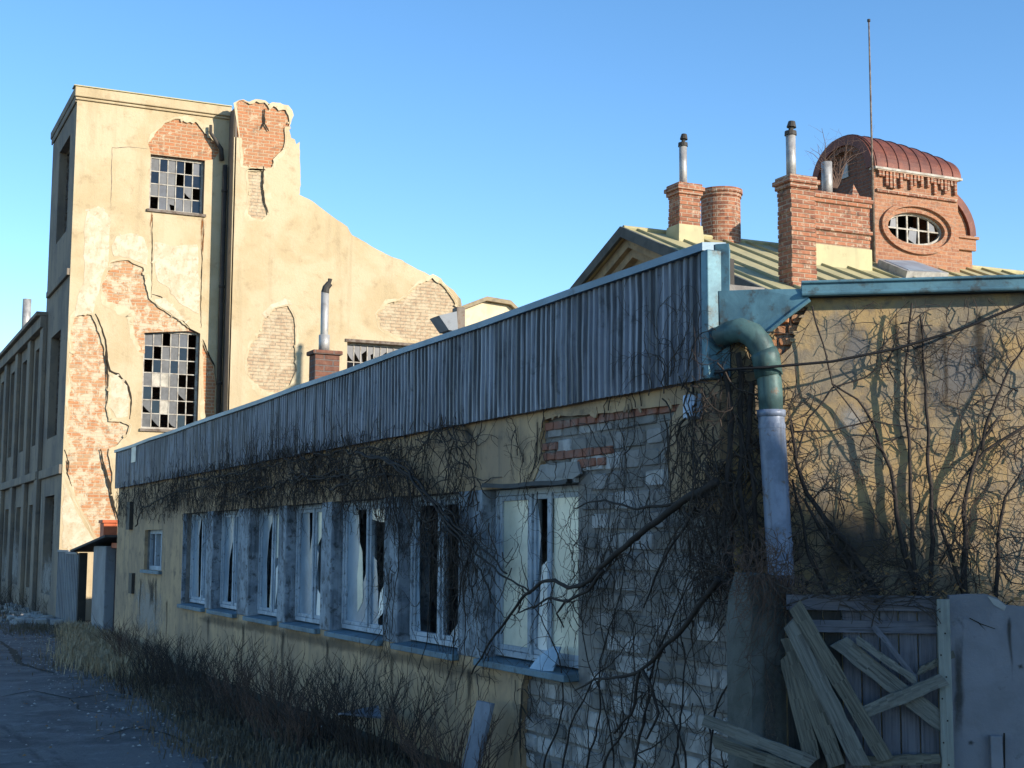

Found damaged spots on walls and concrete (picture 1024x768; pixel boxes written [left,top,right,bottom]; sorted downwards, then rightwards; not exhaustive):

flaking render [148,115,219,161]
flaking render [234,99,294,222]
crack [95,314,132,419]
flaking render [62,206,200,550]
flaking render [245,298,301,396]
flaking render [375,274,459,343]
flaking render [519,399,732,768]